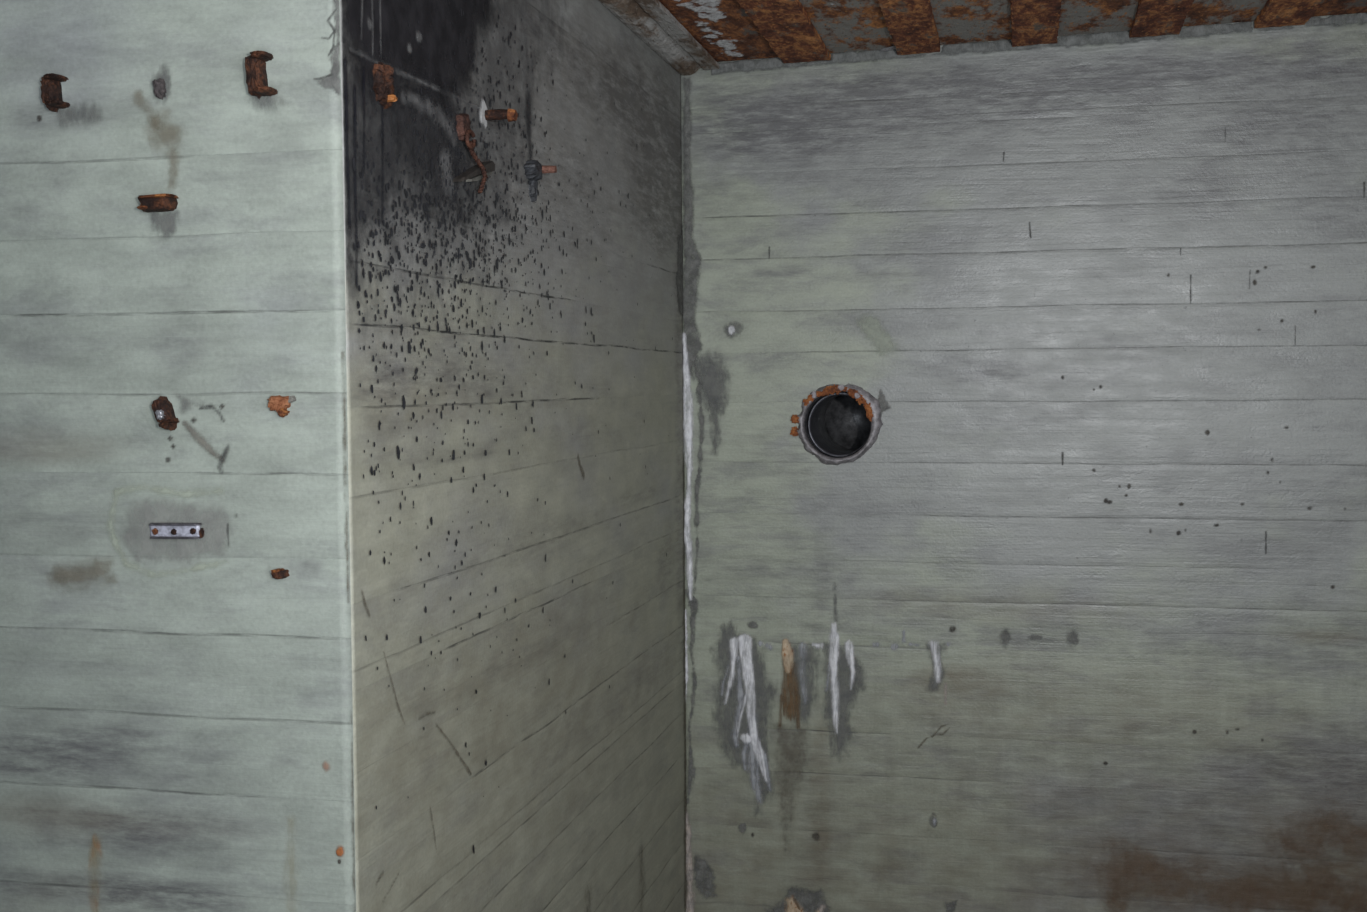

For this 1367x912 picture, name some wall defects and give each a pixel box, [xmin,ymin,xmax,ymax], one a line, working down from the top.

leakage [692,358,726,453]
rust [790,384,874,436]
leakage [715,624,775,809]
leakage [792,624,863,754]
leakage [873,631,949,703]
spalling [768,888,829,912]